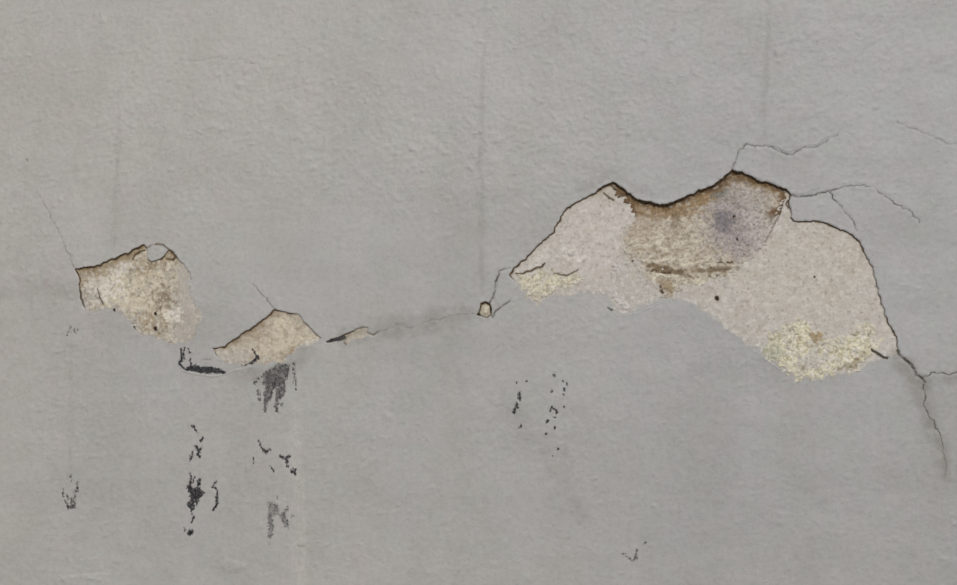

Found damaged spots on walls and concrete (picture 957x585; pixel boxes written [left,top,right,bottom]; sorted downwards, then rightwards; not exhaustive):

flaking render [75,243,379,412]
flaking render [509,169,898,383]